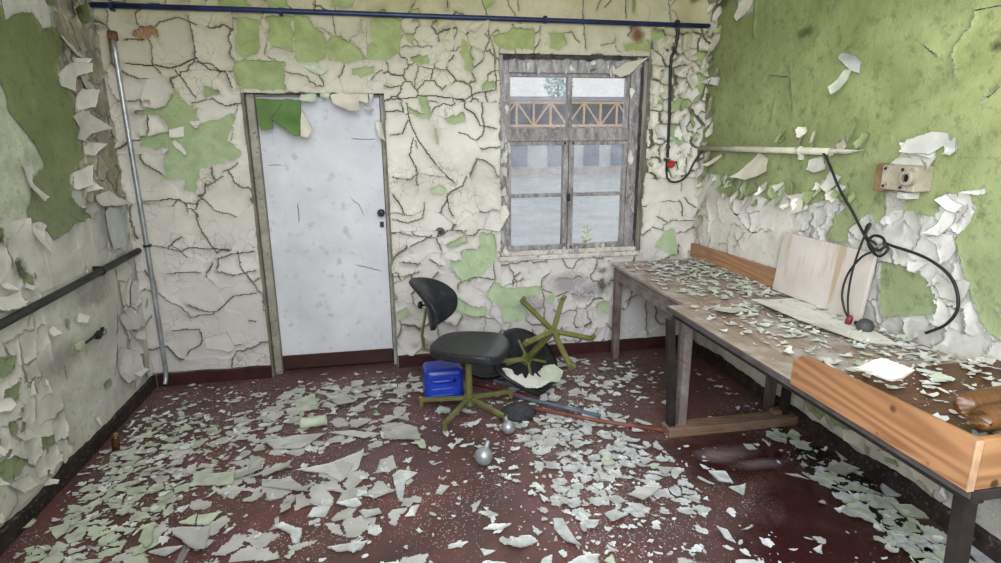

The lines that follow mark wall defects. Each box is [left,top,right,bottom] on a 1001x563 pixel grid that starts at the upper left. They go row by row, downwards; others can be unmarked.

crack [126,22,230,96]
crack [159,237,253,356]
crack [388,0,496,276]
peeling [0,0,1001,388]
peeling [0,308,90,527]
peeling [776,383,952,509]